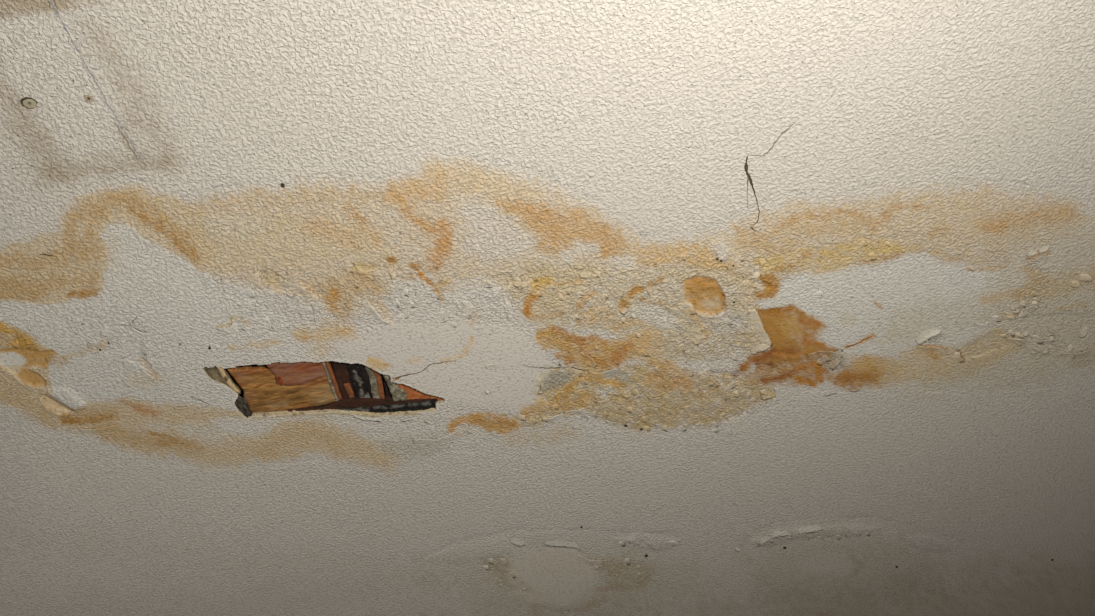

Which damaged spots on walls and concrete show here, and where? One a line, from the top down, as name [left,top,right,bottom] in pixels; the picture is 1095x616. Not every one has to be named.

crack [744,121,797,232]
water stain [0,323,402,474]
water stain [412,407,597,454]
peeling [0,220,1031,441]
water stain [0,149,1095,393]